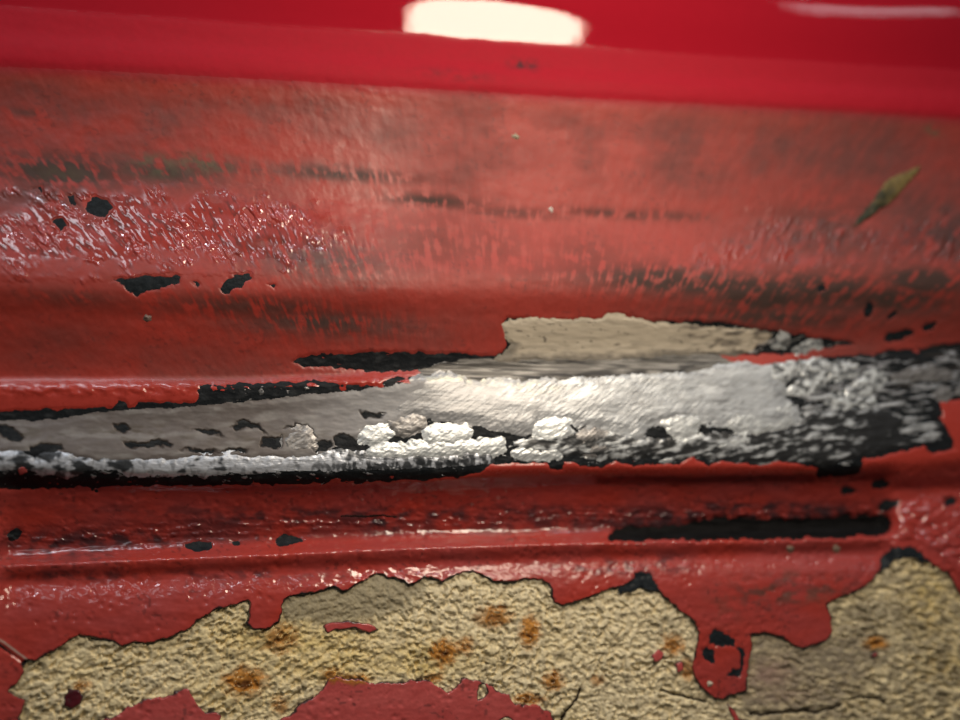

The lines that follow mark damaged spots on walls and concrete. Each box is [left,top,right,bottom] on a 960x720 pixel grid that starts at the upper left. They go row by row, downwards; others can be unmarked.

peeling [68,195,113,217]
peeling [114,275,181,297]
peeling [494,313,772,362]
peeling [608,479,900,542]
corrosion [269,630,292,644]
peeling [9,546,960,720]
corrosion [520,618,540,644]
corrosion [427,639,470,681]
corrosion [545,671,561,689]
crack [560,688,581,720]
crack [660,690,707,702]
crack [749,696,886,716]